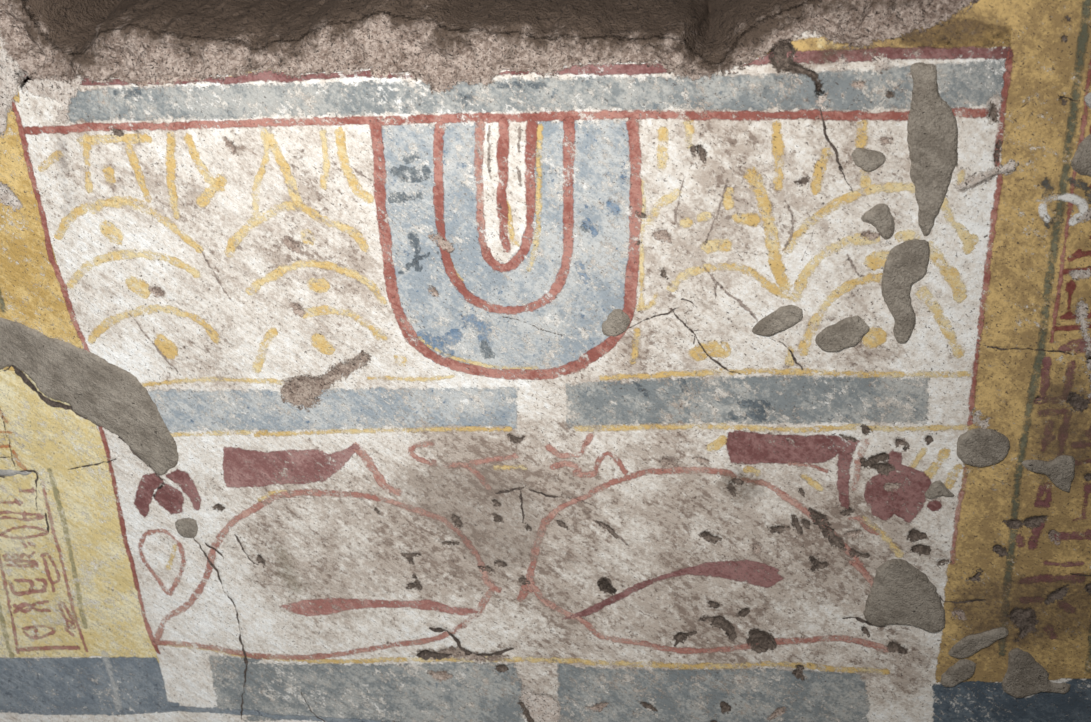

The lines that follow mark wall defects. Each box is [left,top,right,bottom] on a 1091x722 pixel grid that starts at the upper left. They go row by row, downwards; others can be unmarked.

flaking render [0,0,979,138]
spalling [690,144,708,162]
crack [820,109,853,192]
flaking render [0,182,23,211]
spalling [280,236,303,253]
spalling [652,228,672,243]
spalling [860,230,880,241]
spalling [148,284,165,297]
crack [629,298,740,374]
flaking render [280,350,372,412]
crack [193,534,259,720]